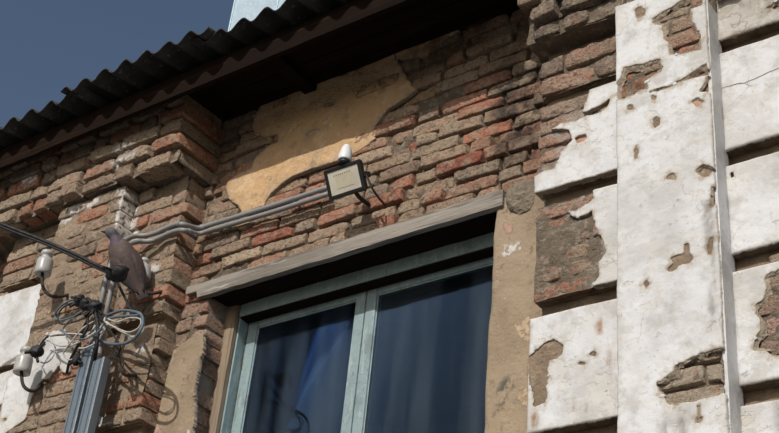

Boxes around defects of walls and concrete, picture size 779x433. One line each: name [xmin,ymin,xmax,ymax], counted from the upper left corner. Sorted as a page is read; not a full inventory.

spalling [620,0,702,56]
peeling [225,20,482,213]
spalling [617,59,709,110]
peeling [668,244,693,272]
spalling [753,253,779,357]
peeling [0,329,75,433]
peeling [517,340,563,407]
spalling [658,348,725,423]